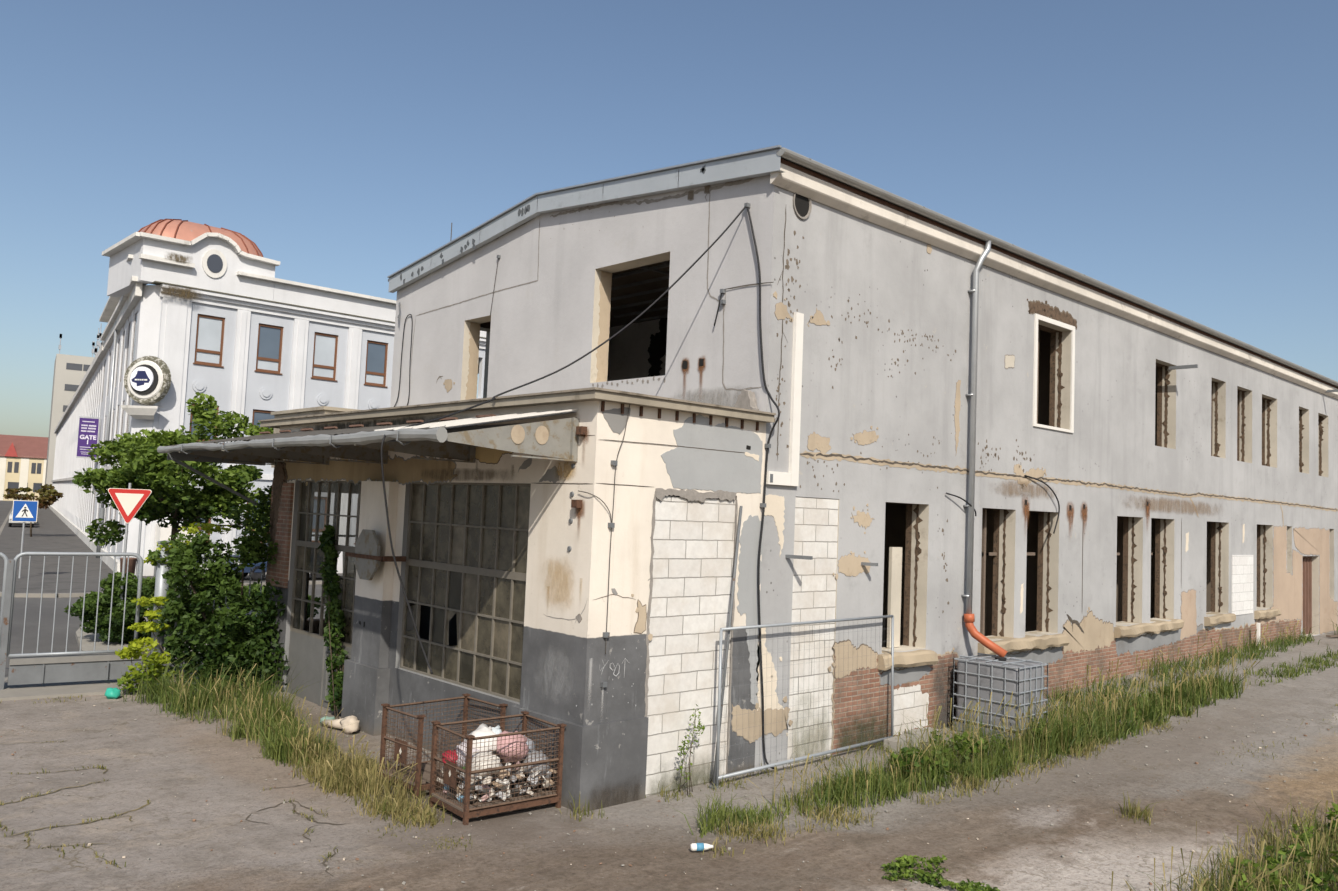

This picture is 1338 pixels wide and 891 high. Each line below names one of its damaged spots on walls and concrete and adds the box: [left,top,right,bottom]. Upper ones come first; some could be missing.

flaking render [773,230,956,389]
spalling [1027,299,1077,330]
flaking render [800,431,845,492]
flaking render [850,426,883,454]
flaking render [851,504,874,534]
peeling [661,365,793,744]
flaking render [833,551,871,580]
flaking render [1007,525,1338,699]
flaking render [828,639,959,755]